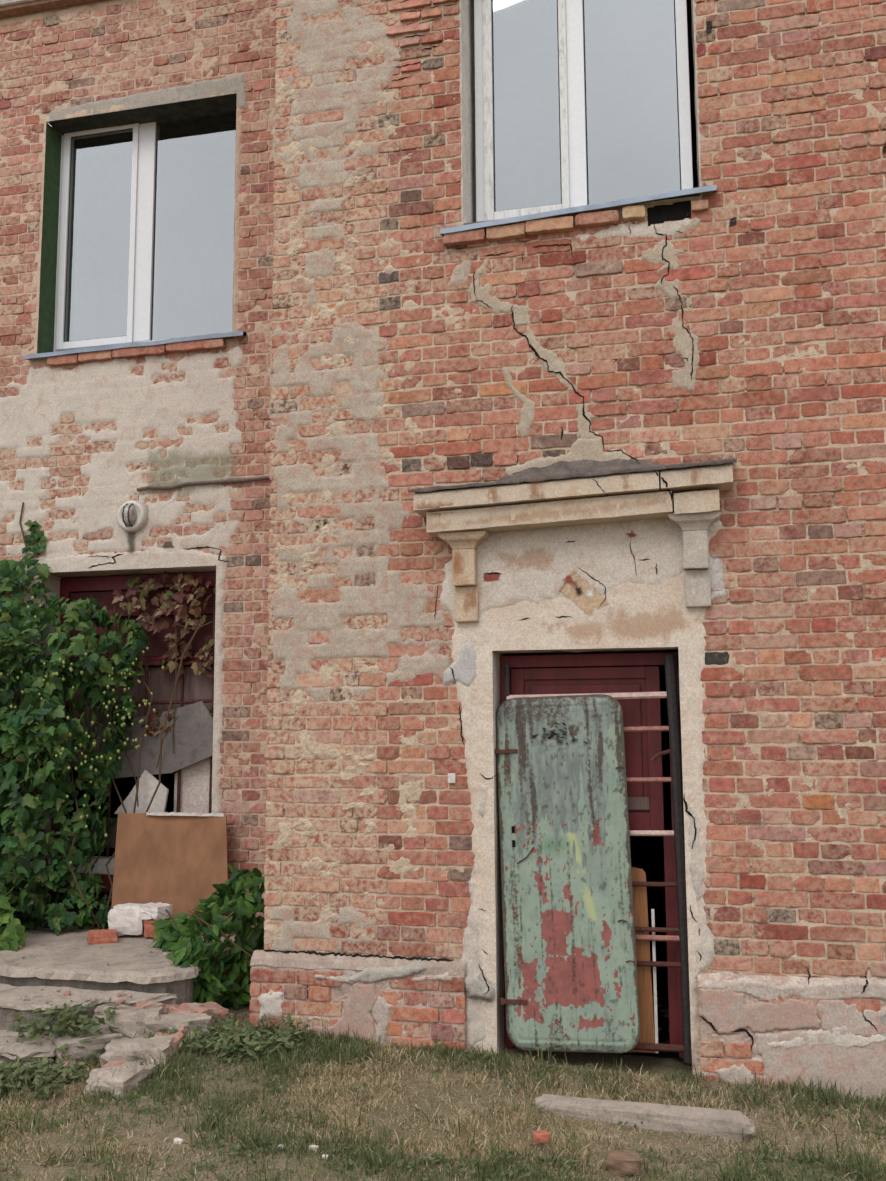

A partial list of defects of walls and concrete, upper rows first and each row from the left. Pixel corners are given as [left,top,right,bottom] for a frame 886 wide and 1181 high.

crack [392,0,457,81]
flaking render [269,0,401,310]
crack [629,217,704,395]
crack [466,244,674,511]
peeling [0,344,244,559]
flaking render [267,320,455,703]
flaking render [559,571,608,614]
crack [565,541,606,608]
flaking render [282,983,378,1042]
crack [699,1015,754,1050]
crack [861,973,877,1030]